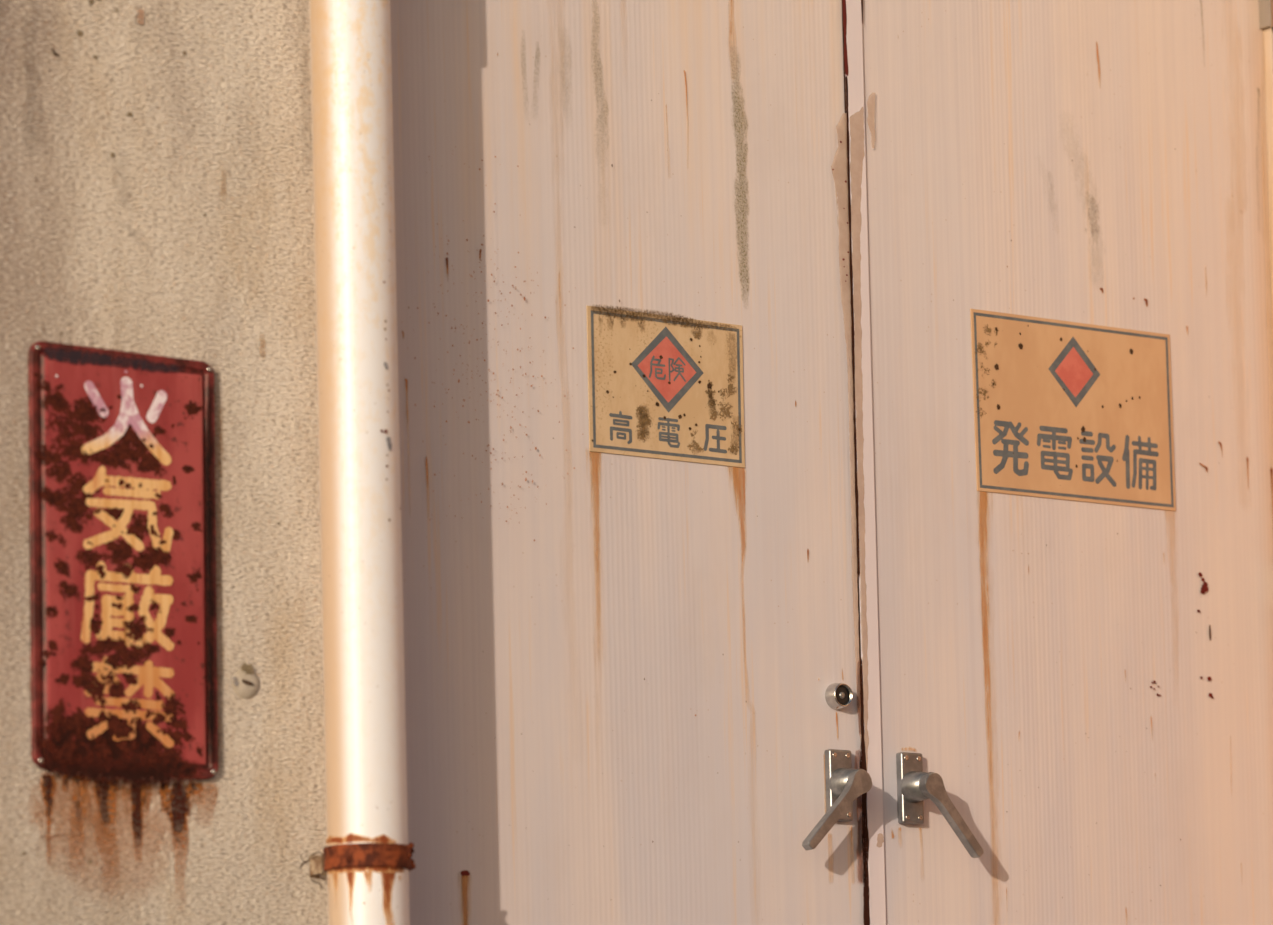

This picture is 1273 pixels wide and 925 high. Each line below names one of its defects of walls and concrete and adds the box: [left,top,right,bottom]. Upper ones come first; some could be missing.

leakage [734,91,748,291]
leakage [831,93,875,768]
rust [733,467,758,557]
rust [40,774,216,856]
rust [326,833,416,925]
rust [461,870,470,925]